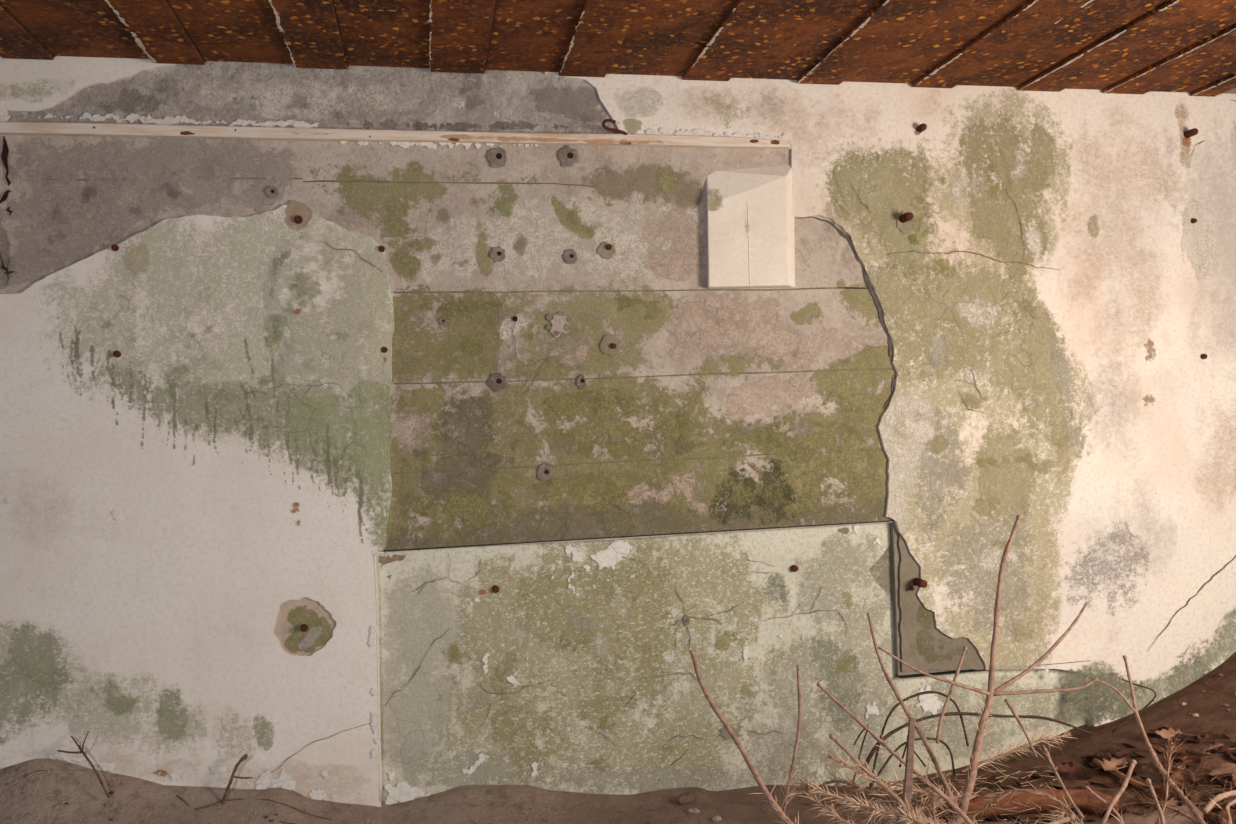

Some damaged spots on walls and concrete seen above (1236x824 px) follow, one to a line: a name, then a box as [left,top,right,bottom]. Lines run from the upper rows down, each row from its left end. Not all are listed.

crack [0,136,13,215]
crack [0,254,14,284]
water stain [60,328,217,464]
water stain [242,386,368,542]
spalling [0,61,985,719]
crack [1147,556,1236,652]